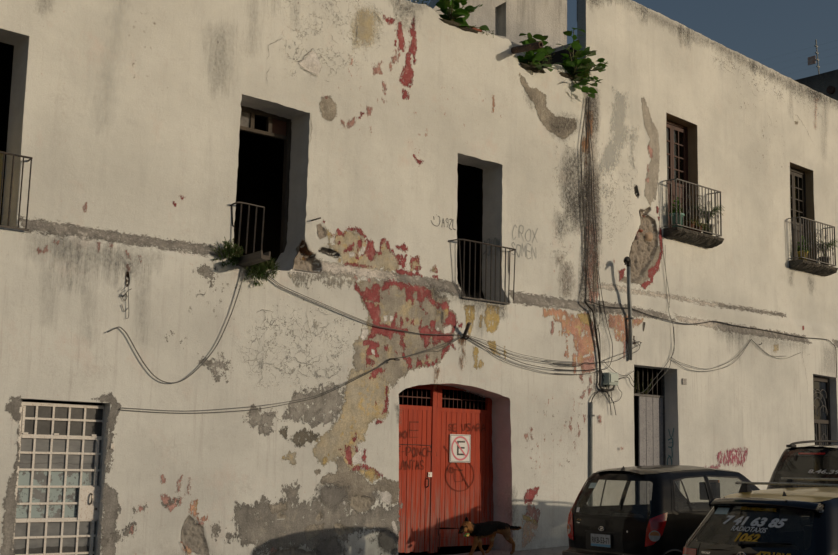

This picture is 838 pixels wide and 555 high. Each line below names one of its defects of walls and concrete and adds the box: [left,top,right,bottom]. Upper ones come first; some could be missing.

peeling [371,15,418,103]
flaking render [519,73,577,139]
damp [563,92,634,296]
spalling [542,97,663,453]
peeling [159,220,507,555]
peeling [522,486,540,548]